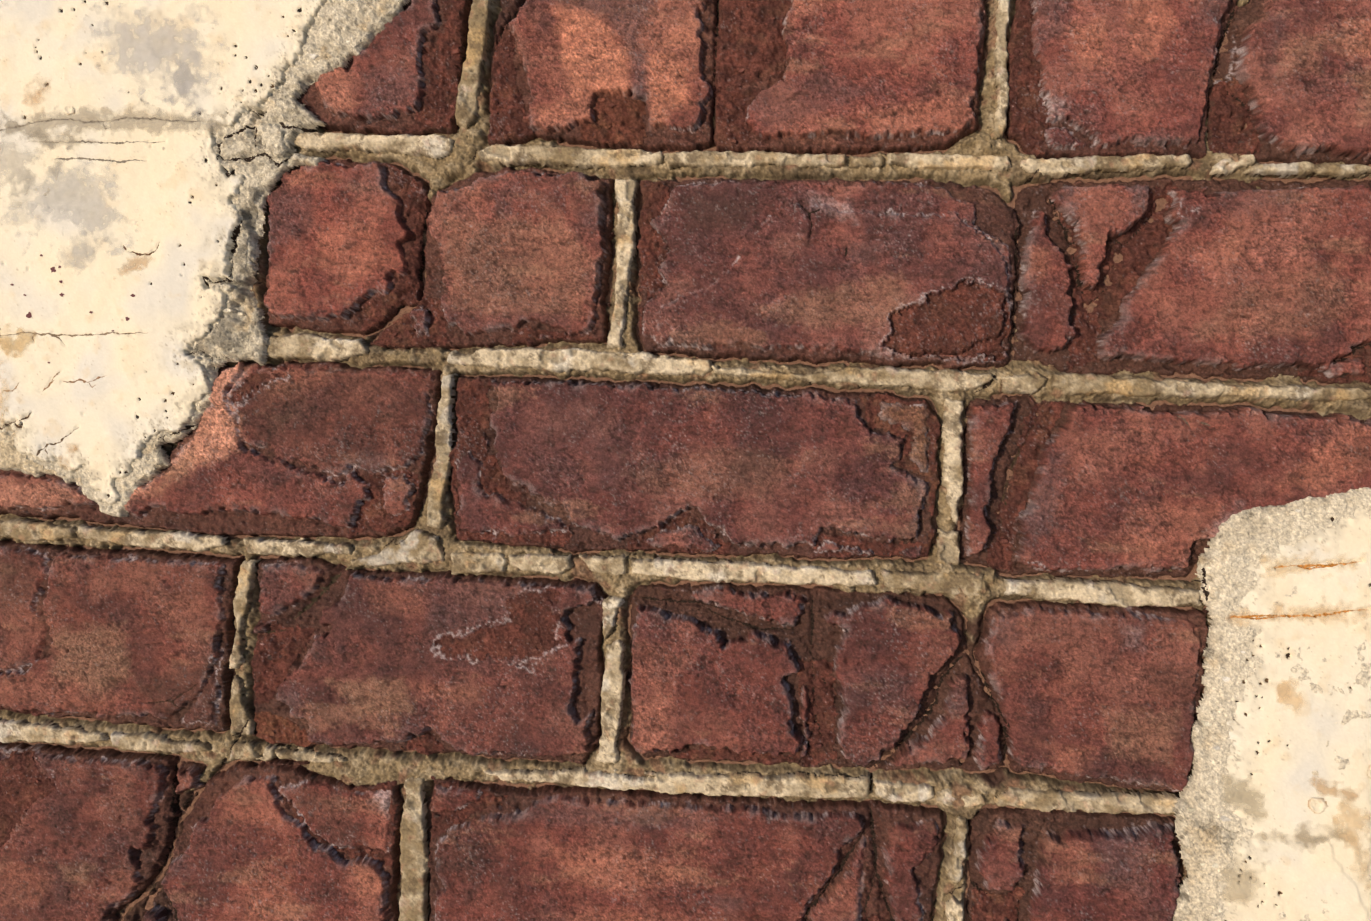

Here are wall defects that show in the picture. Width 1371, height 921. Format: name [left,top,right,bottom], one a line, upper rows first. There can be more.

spalling [226,0,399,126]
spalling [402,0,465,134]
spalling [710,0,792,149]
spalling [1007,0,1051,155]
spalling [1204,77,1263,156]
spalling [176,185,263,385]
spalling [883,280,1012,361]
spalling [1059,182,1178,371]
spalling [102,392,175,508]
spalling [434,588,563,661]
spalling [1183,488,1371,921]
crack [124,715,254,921]